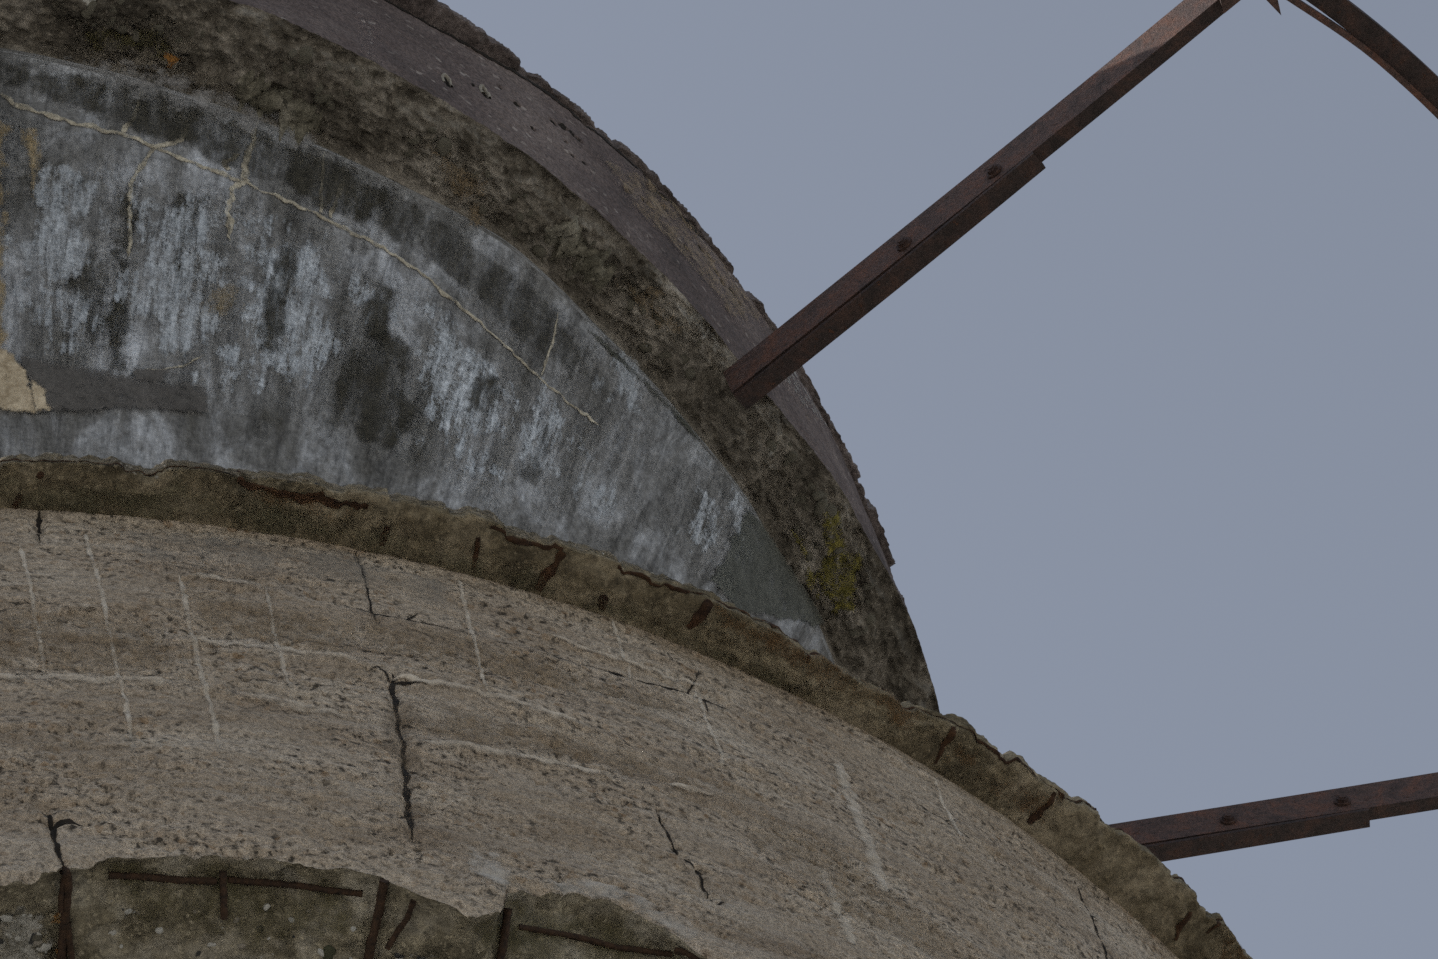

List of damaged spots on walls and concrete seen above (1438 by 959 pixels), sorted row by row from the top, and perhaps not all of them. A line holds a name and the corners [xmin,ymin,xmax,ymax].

water stain [11,61,578,360]
crack [1,93,599,425]
water stain [27,166,573,482]
water stain [593,333,696,437]
spalling [9,452,704,590]
water stain [692,492,824,628]
water stain [102,599,131,722]
crack [369,666,420,842]
spalling [0,866,75,959]
spalling [108,870,425,959]
spalling [496,908,700,959]
crack [1066,866,1108,959]